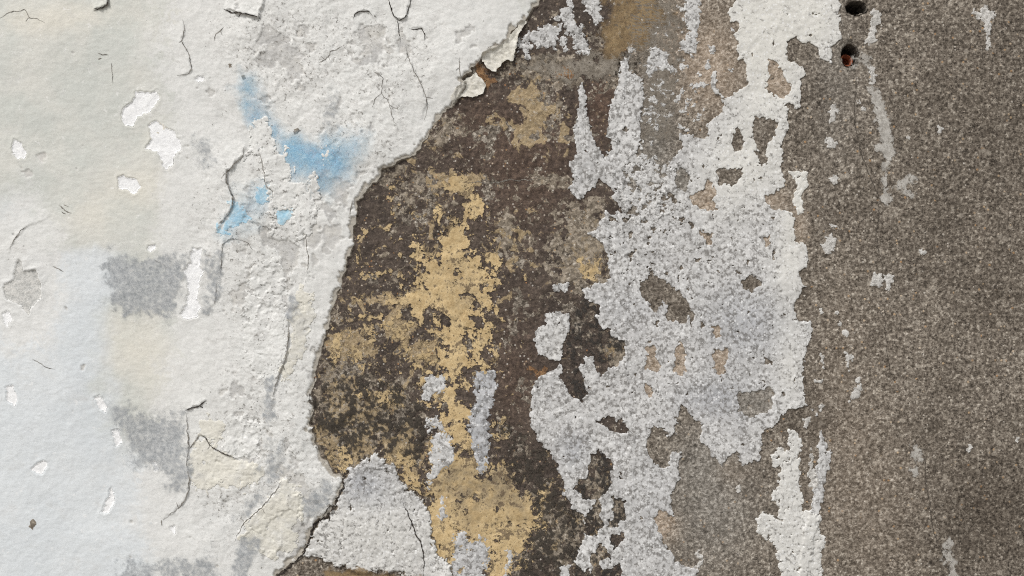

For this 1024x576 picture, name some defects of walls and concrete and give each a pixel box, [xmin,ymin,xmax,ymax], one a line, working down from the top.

crack [353,0,430,112]
peeling [121,91,181,170]
peeling [117,175,141,194]
peeling [2,260,41,327]
peeling [311,0,842,576]
crack [161,401,234,525]
crack [234,482,281,542]